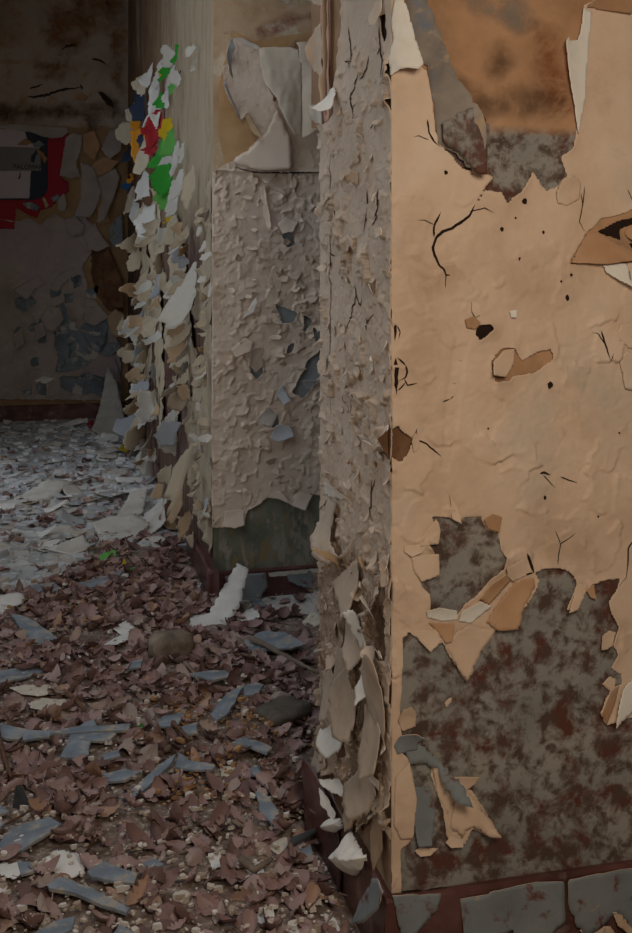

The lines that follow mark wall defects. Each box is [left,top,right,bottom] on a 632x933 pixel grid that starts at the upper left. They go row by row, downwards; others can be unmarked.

peeling [367,0,632,206]
peeling [219,0,363,292]
crack [424,205,492,286]
flaking render [560,210,632,286]
peeling [465,301,494,340]
peeling [491,348,553,382]
peeling [354,425,419,468]
peeling [29,123,392,892]
crack [620,542,632,585]
peeling [10,684,67,710]
peeling [392,495,632,933]
peeling [0,861,21,880]